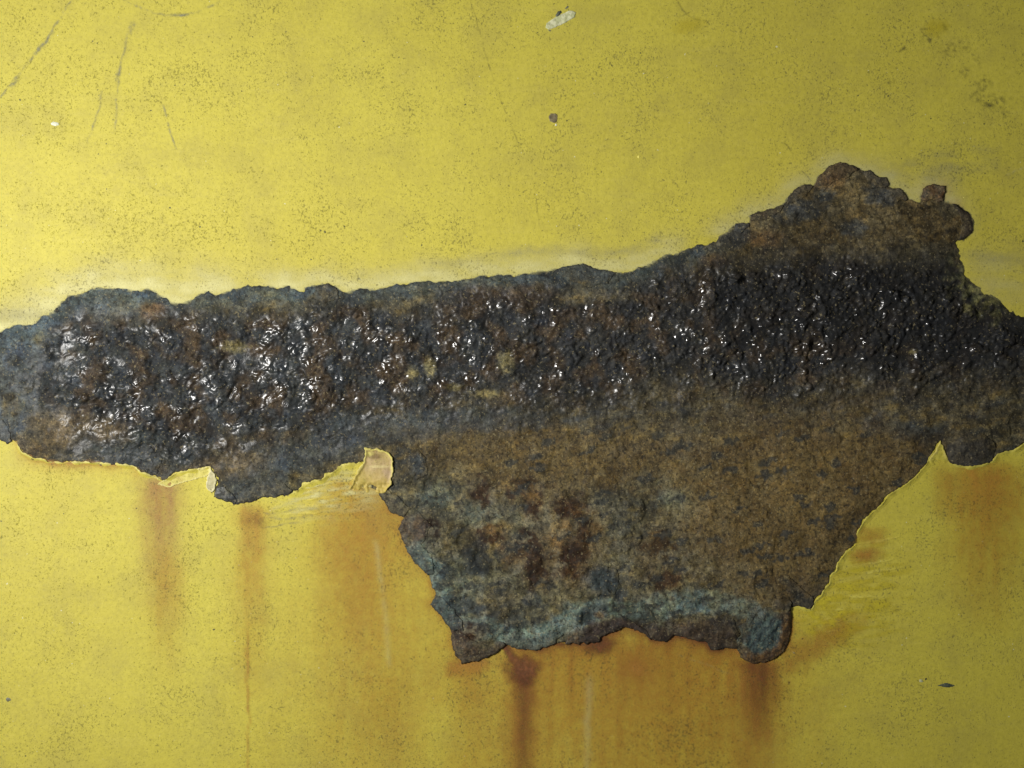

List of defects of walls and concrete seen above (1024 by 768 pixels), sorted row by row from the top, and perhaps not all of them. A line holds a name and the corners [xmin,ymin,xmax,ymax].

peeling [289,447,394,499]
corrosion [0,162,1024,748]